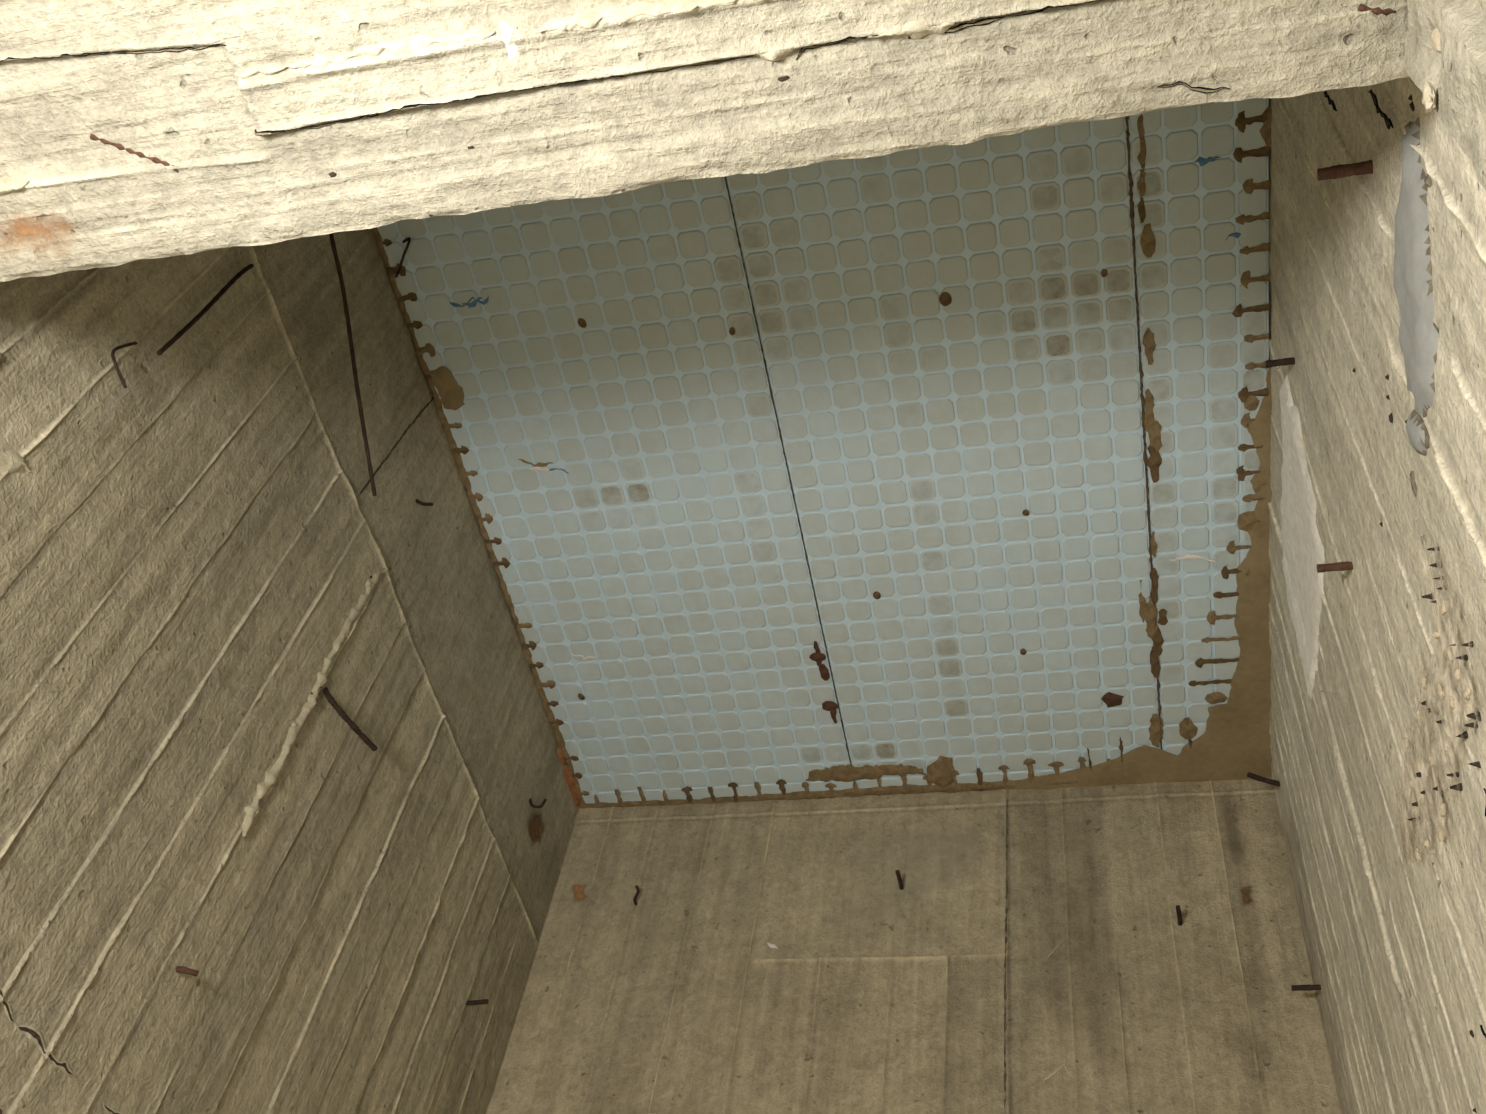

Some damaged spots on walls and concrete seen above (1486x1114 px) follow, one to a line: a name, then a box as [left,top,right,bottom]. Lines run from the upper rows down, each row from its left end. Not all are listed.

crack [0,44,226,63]
corrosion [724,176,855,784]
corrosion [1101,692,1124,708]
crack [0,986,122,1114]